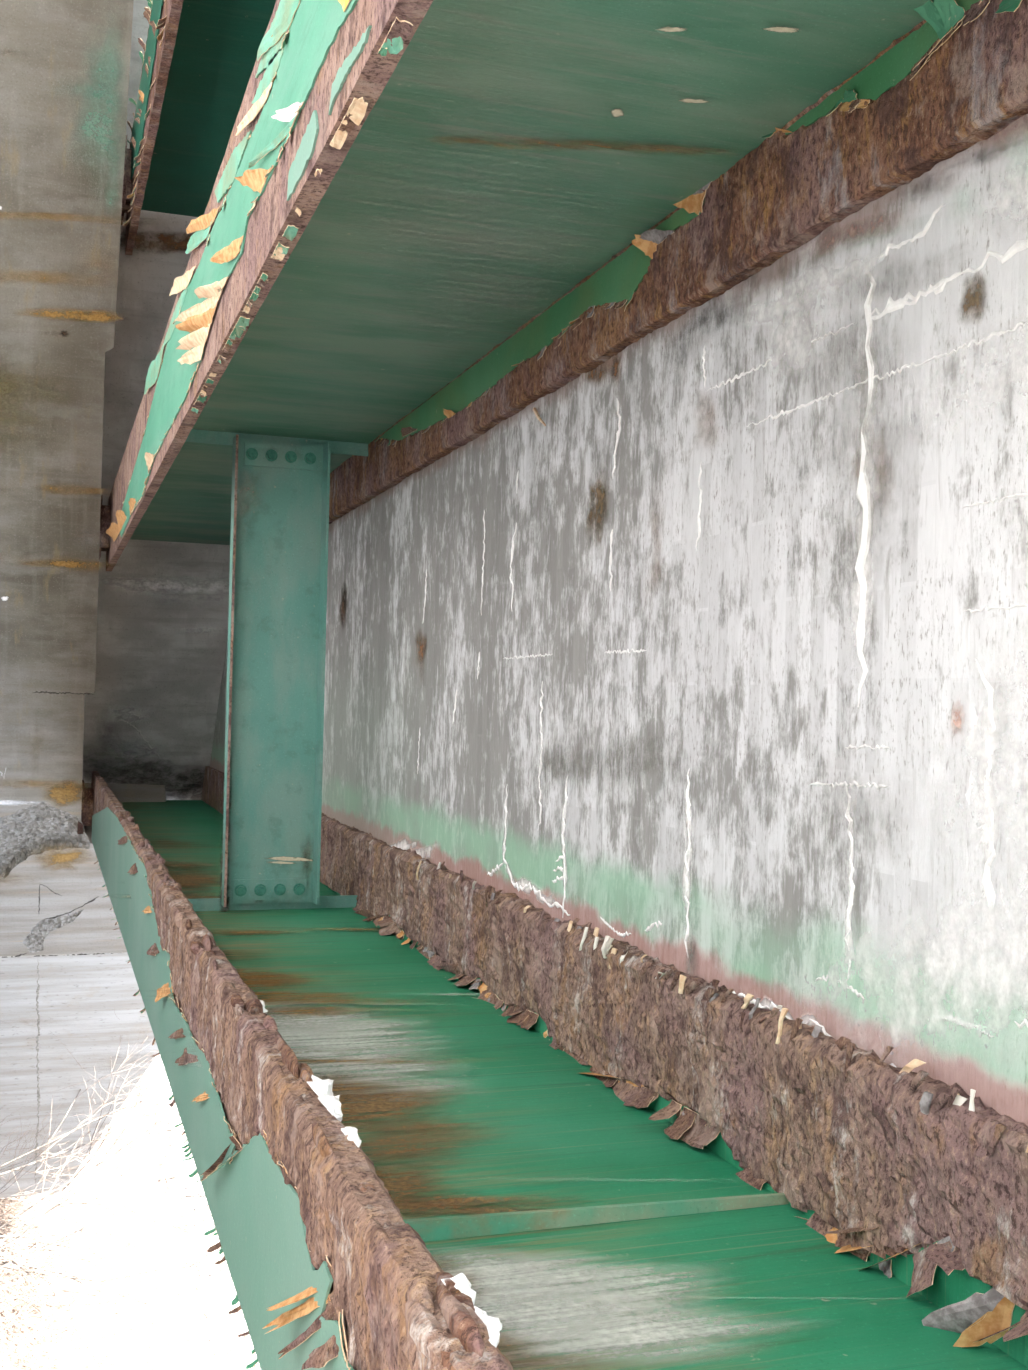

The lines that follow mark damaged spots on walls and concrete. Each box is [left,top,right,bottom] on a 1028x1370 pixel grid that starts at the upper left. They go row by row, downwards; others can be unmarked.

peeling [106,72,304,542]
water stain [707,240,1028,391]
crack [853,270,953,707]
rust [118,434,540,1250]
crack [487,681,570,918]
crack [683,768,692,957]
water stain [859,904,1028,1041]
water stain [260,1000,446,1148]
peeling [237,1286,354,1370]
rust [405,1264,515,1370]
rust [906,1241,965,1297]
peeling [922,1287,1028,1347]